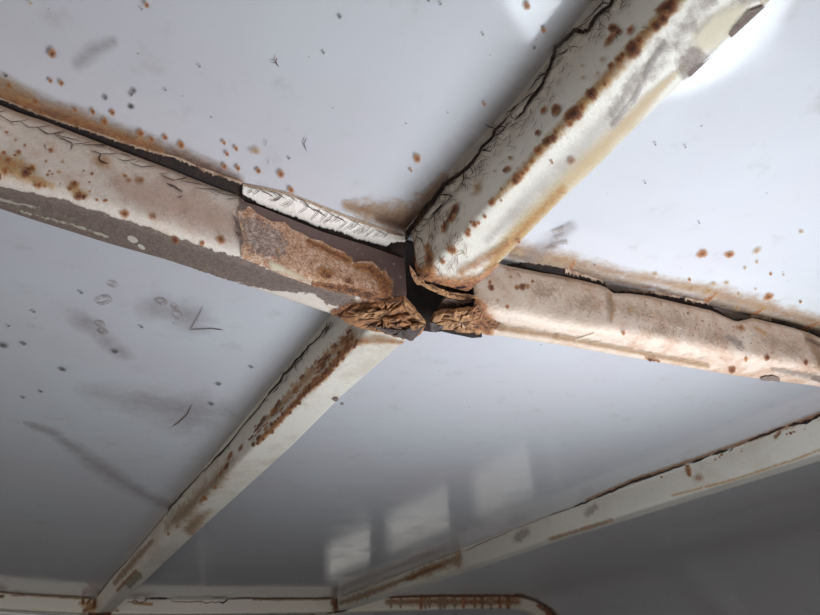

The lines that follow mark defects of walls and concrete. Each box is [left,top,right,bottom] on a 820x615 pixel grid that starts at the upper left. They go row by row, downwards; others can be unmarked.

rust [0,131,108,202]
rust [0,77,242,185]
crack [0,0,651,280]
rust [237,206,426,330]
rust [441,203,458,232]
rust [488,0,681,206]
crack [0,322,332,600]
rust [167,326,404,535]
rust [113,540,153,591]
rust [328,550,557,615]